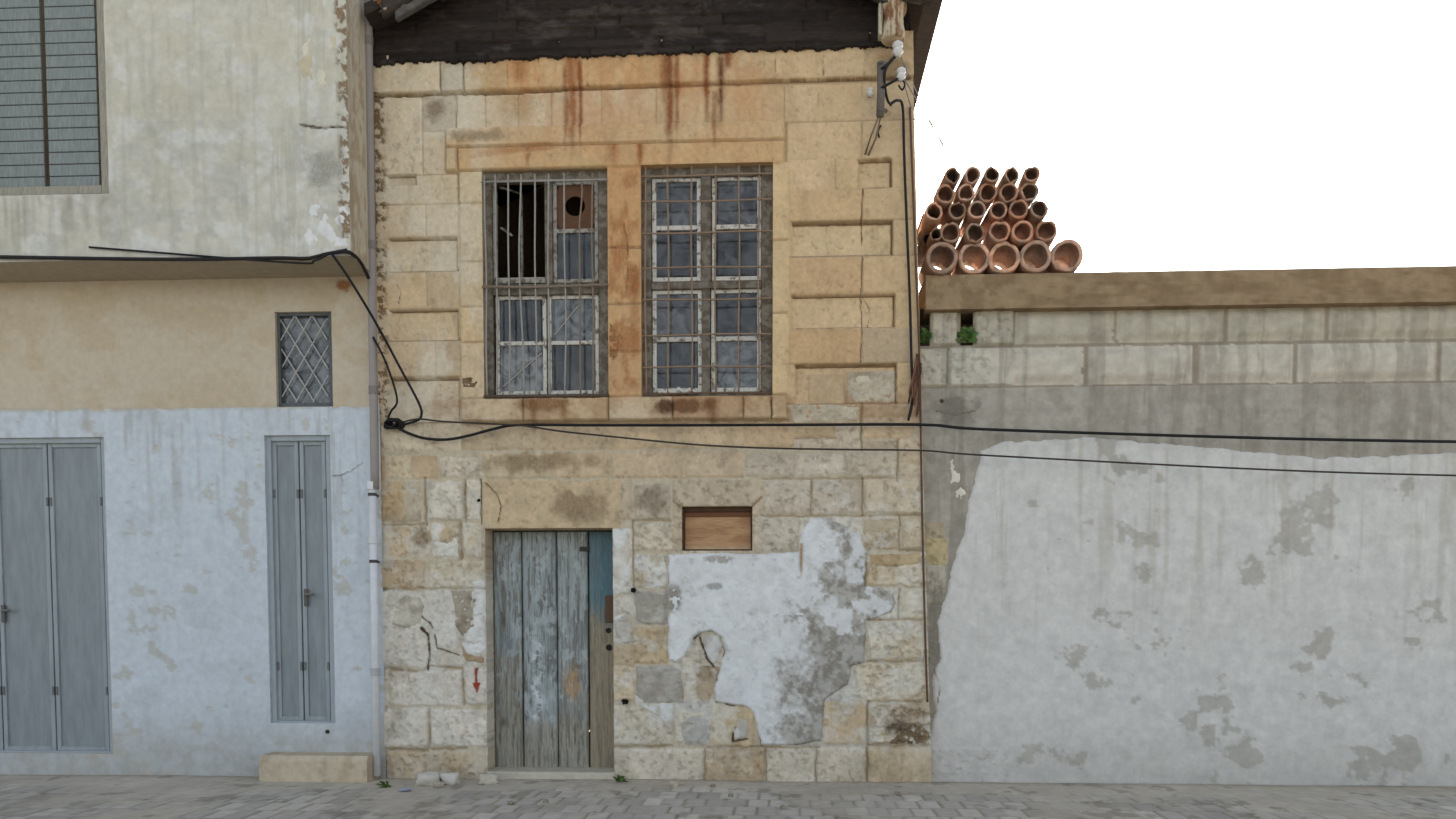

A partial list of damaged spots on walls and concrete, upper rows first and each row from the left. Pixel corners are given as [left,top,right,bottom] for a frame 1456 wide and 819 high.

peeling [296,0,350,247]
corrosion [568,58,582,132]
corrosion [667,57,679,129]
corrosion [704,52,730,107]
spalling [374,92,388,418]
peeling [613,517,896,745]